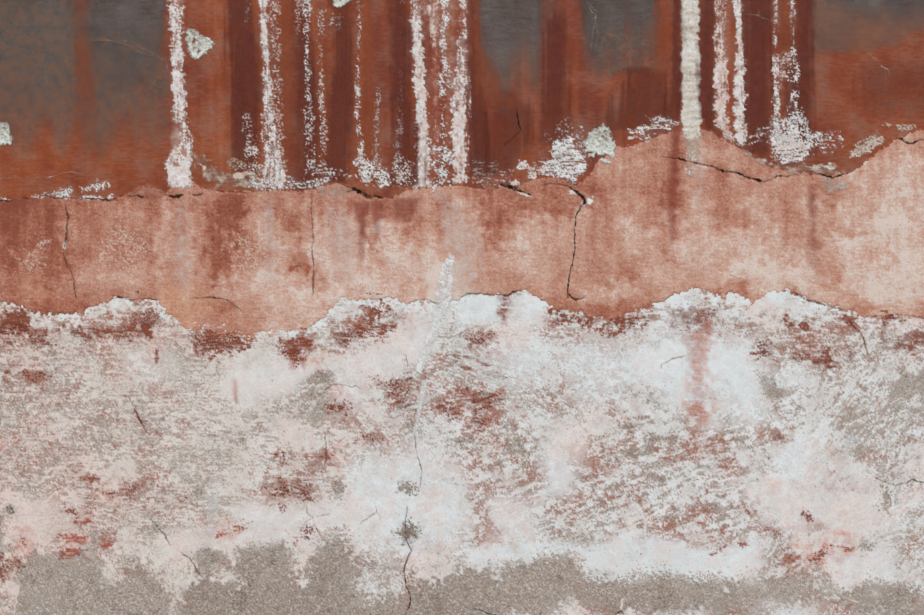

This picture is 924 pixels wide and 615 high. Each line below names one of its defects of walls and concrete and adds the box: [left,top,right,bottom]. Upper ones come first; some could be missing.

corrosion [318,17,328,140]
corrosion [358,0,373,175]
damp [581,0,924,175]
damp [228,0,587,278]
crack [675,157,789,182]
crack [500,183,586,300]
peeling [0,308,162,346]
peeling [276,328,313,367]
peeling [333,293,397,347]
peeling [548,307,648,338]
flaking render [0,549,173,615]
flaking render [184,524,924,615]